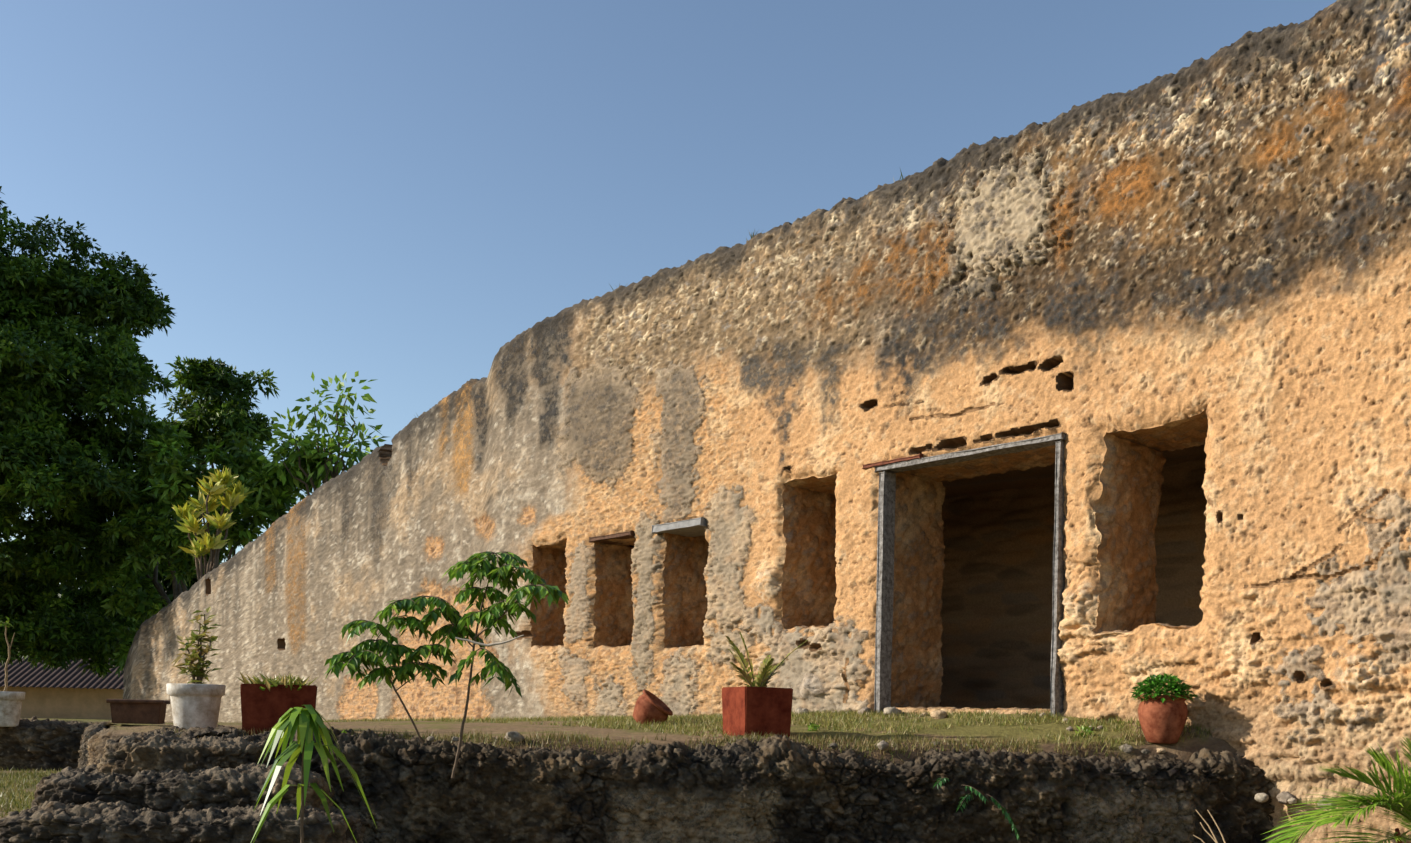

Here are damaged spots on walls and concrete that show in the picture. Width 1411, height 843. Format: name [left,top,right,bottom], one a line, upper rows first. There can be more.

damp [1152,237,1293,320]
damp [876,273,1125,404]
damp [473,312,624,473]
damp [740,342,848,462]
crack [1244,489,1390,588]
peeling [1345,488,1411,544]
peeling [703,603,822,670]
peeling [1273,667,1370,742]